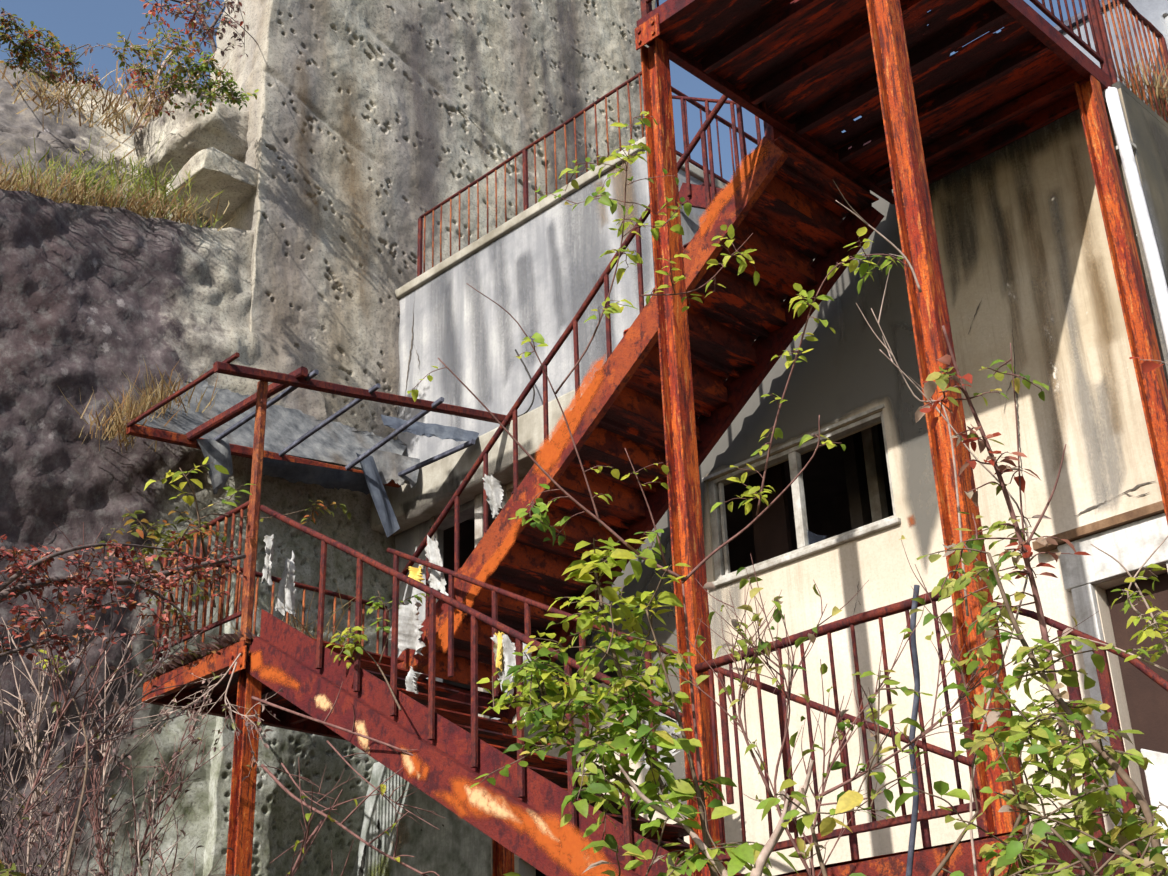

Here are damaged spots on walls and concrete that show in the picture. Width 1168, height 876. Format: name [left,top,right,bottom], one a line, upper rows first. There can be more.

leakage [435,275,458,405]
leakage [465,258,486,403]
leakage [517,257,527,302]
leakage [541,0,607,378]
leakage [621,164,649,286]
corrosion [699,142,769,237]
leakage [943,168,1009,285]
leakage [1053,197,1120,505]
leakage [1150,310,1168,385]
corrosion [535,357,604,471]
corrosion [436,517,522,651]
crack [358,819,381,876]